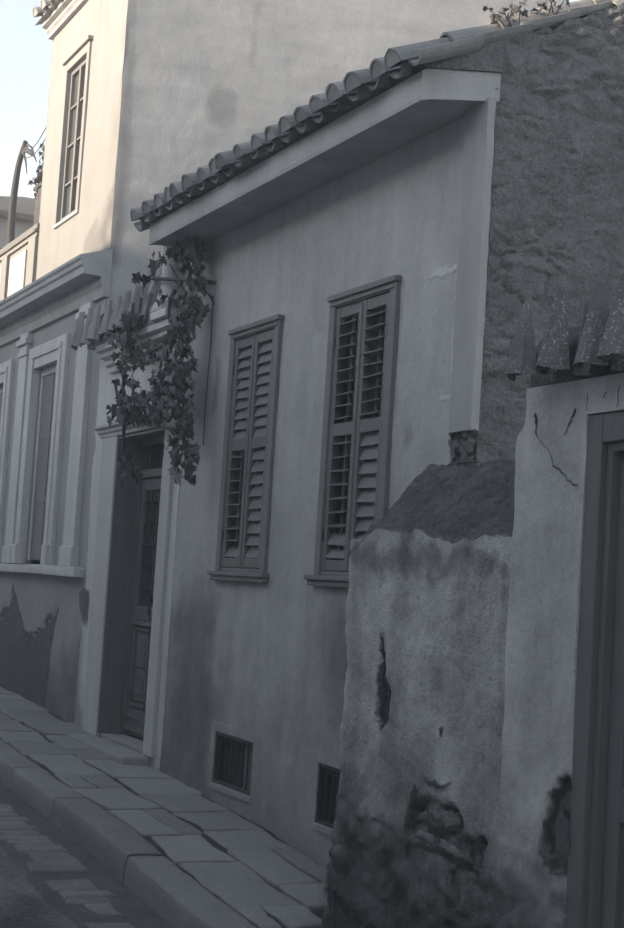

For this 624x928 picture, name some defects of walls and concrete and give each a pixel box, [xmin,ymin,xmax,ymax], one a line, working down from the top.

crack [534,385,620,486]
flaking render [0,585,59,708]
flaking render [376,635,391,730]
flaking render [404,777,488,882]
flaking render [538,775,572,875]